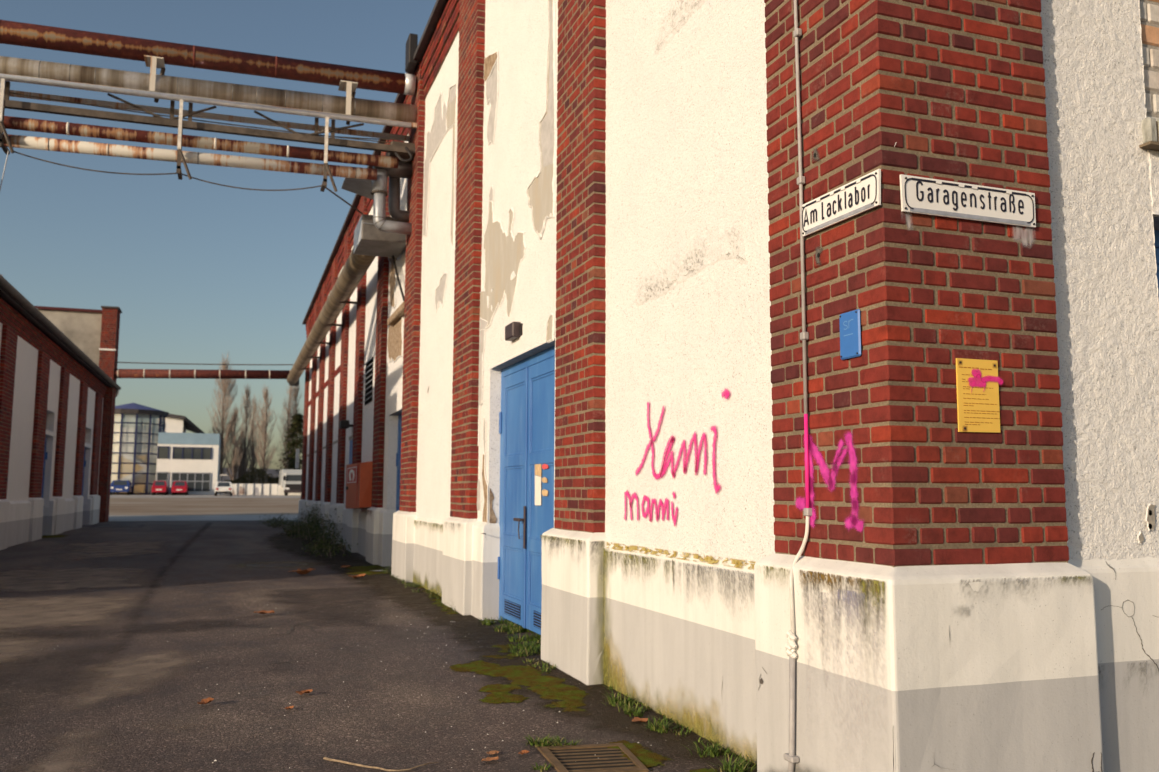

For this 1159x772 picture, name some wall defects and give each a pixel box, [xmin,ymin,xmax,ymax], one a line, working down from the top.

flaking render [423,82,458,249]
flaking render [477,0,557,523]
leakage [544,535,667,567]
leakage [800,570,884,617]
crack [1101,562,1159,671]